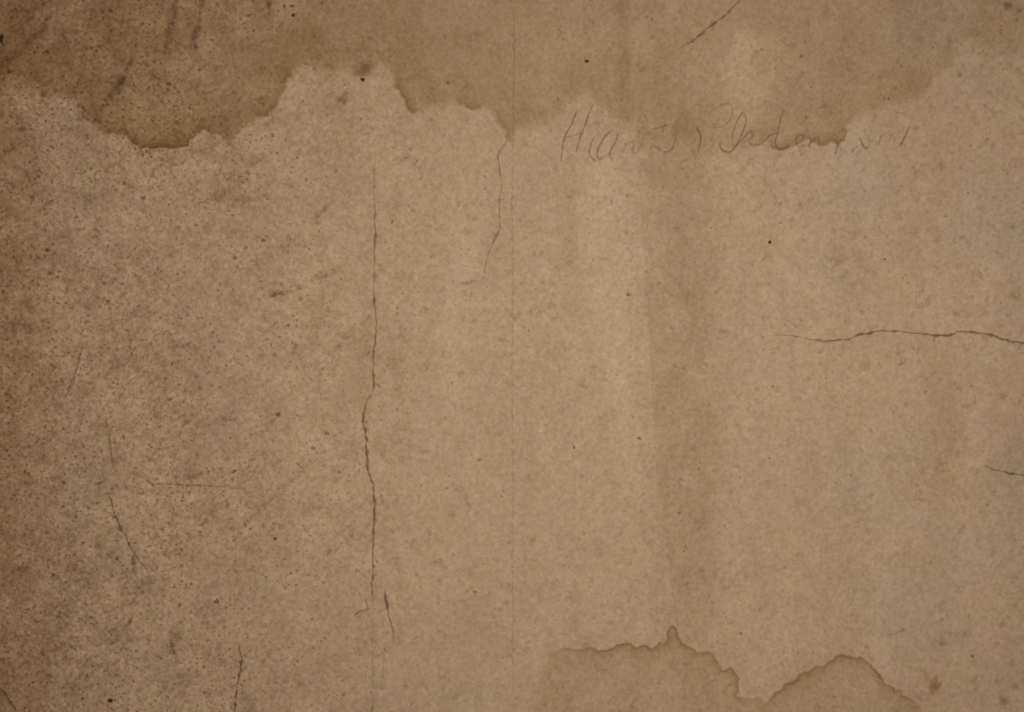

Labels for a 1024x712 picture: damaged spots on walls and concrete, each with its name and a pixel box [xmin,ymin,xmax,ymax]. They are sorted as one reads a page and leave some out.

damp [0,0,637,155]
damp [517,0,1024,712]